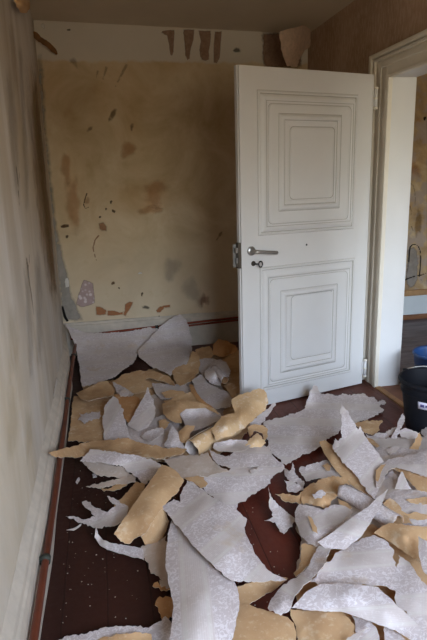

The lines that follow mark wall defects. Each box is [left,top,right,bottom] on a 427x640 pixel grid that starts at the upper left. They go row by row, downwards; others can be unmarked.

peeling [162,30,174,55]
peeling [183,30,211,61]